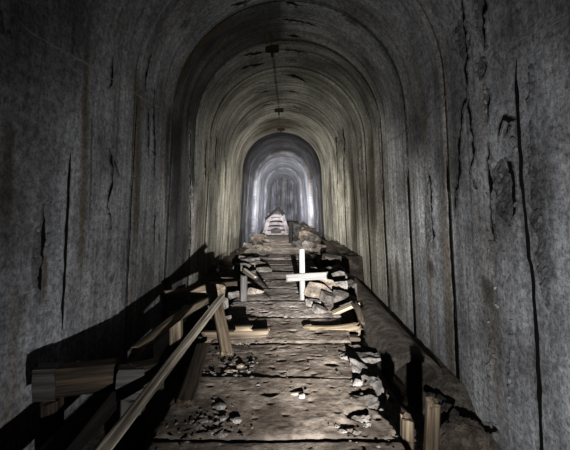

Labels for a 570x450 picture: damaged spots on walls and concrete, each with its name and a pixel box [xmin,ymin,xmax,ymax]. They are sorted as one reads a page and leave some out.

crack [19,21,160,108]
spalling [471,0,489,82]
crack [454,0,517,247]
crack [105,148,121,230]
spalling [492,158,519,231]
crack [36,201,51,303]